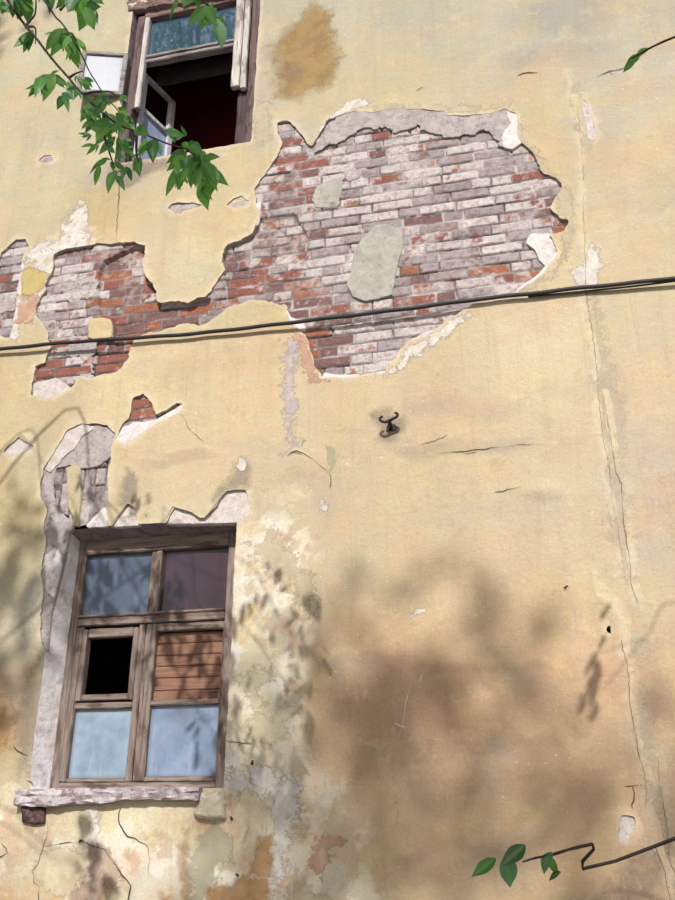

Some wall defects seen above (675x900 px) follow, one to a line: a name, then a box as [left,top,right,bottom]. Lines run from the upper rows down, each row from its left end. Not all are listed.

damp [274,6,336,96]
flaking render [0,93,605,399]
flaking render [0,433,35,457]
flaking render [40,394,183,652]
flaking render [161,487,250,526]
crack [518,66,675,900]
crack [32,824,131,900]
crack [118,808,150,866]
peeling [224,758,360,900]
flaking render [618,815,636,844]